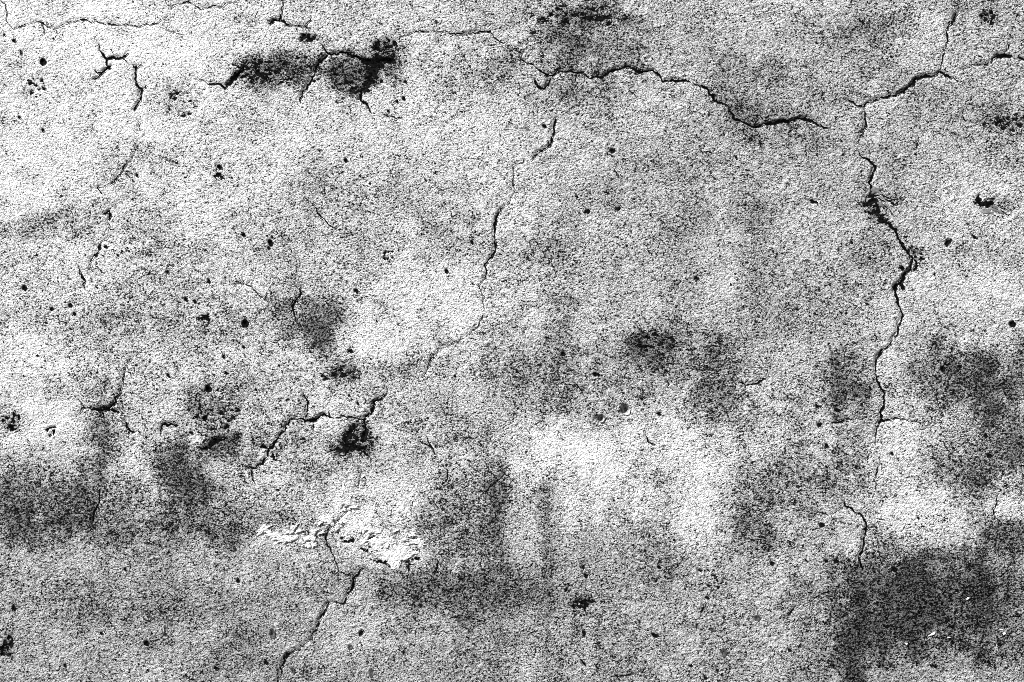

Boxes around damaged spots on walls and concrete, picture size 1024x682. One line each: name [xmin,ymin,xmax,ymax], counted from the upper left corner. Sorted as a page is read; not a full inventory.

crack [1,0,236,290]
crack [268,0,394,103]
crack [244,30,829,486]
crack [844,1,1024,194]
water stain [0,370,588,633]
crack [277,512,364,682]
peeling [257,502,433,574]
crack [814,220,920,568]
water stain [720,309,1024,682]